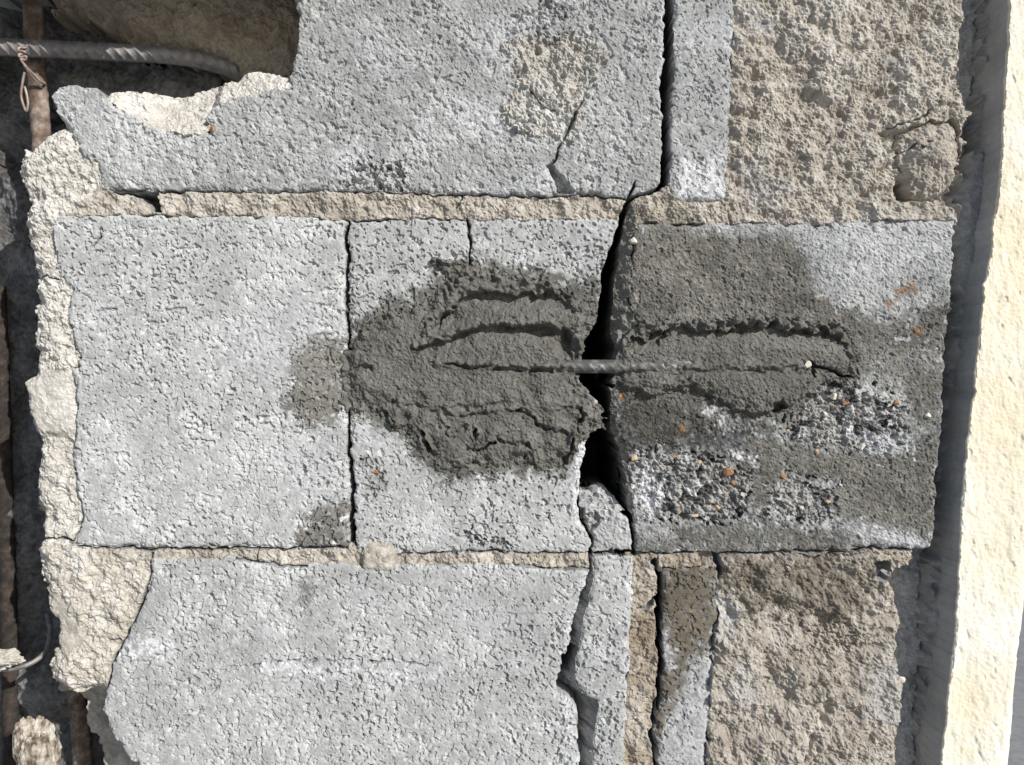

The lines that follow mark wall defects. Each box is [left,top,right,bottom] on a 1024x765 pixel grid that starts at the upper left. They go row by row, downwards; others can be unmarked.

crack [887,108,934,160]
water stain [296,501,355,547]
water stain [279,266,586,519]
crack [110,0,912,765]
water stain [464,252,600,310]
water stain [614,146,954,745]